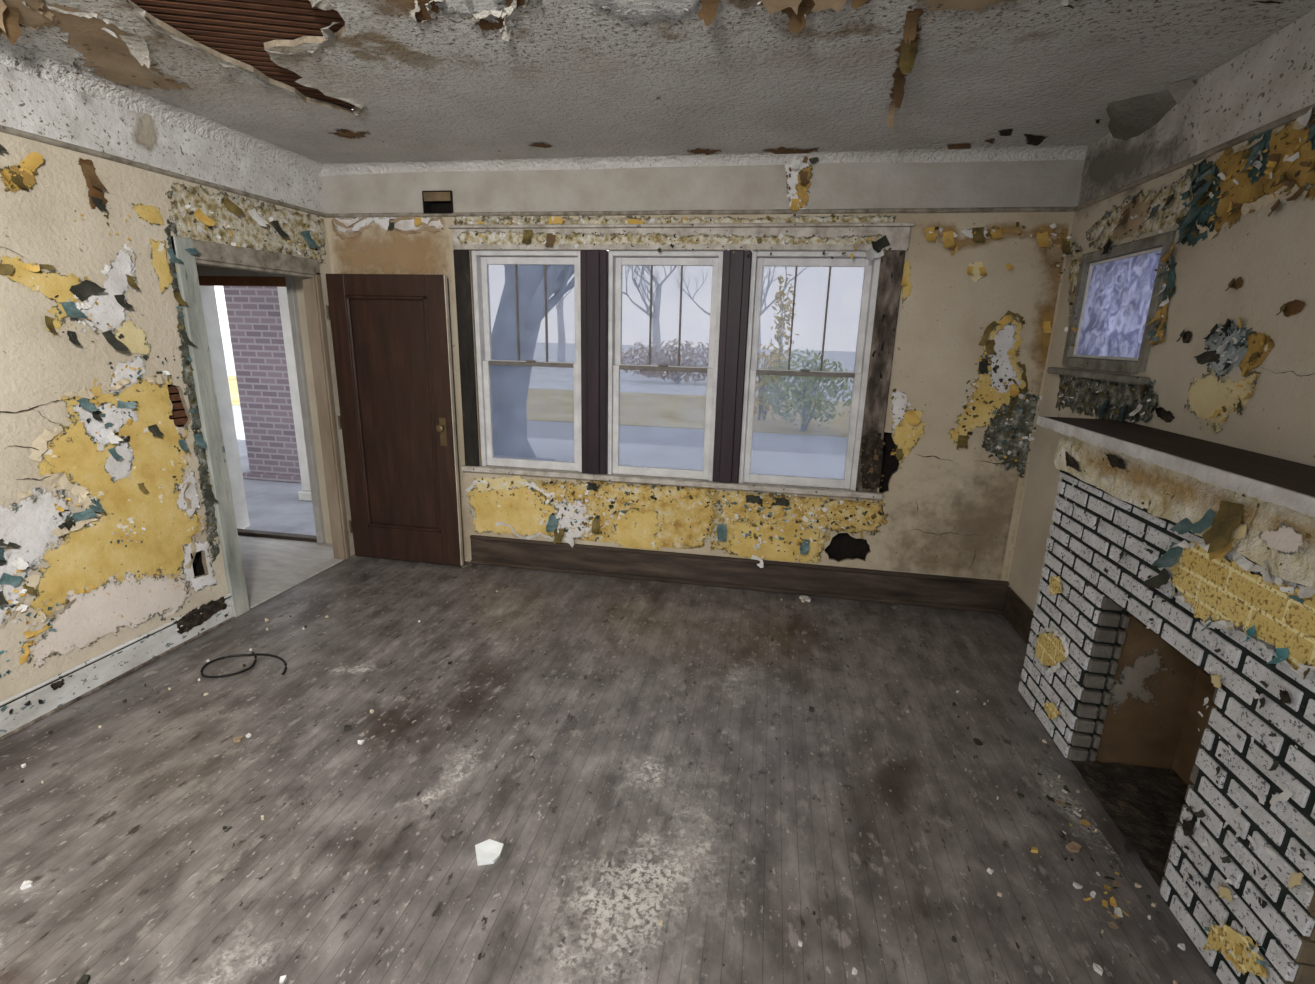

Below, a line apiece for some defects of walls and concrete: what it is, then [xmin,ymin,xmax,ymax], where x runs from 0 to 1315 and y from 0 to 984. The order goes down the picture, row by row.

peeling [0,0,195,93]
spalling [135,0,344,82]
flaking render [591,0,720,26]
peeling [886,6,923,130]
peeling [924,108,1315,478]
peeling [0,144,926,677]
peeling [1049,451,1315,680]
peeling [0,679,65,714]
peeling [1031,626,1069,676]